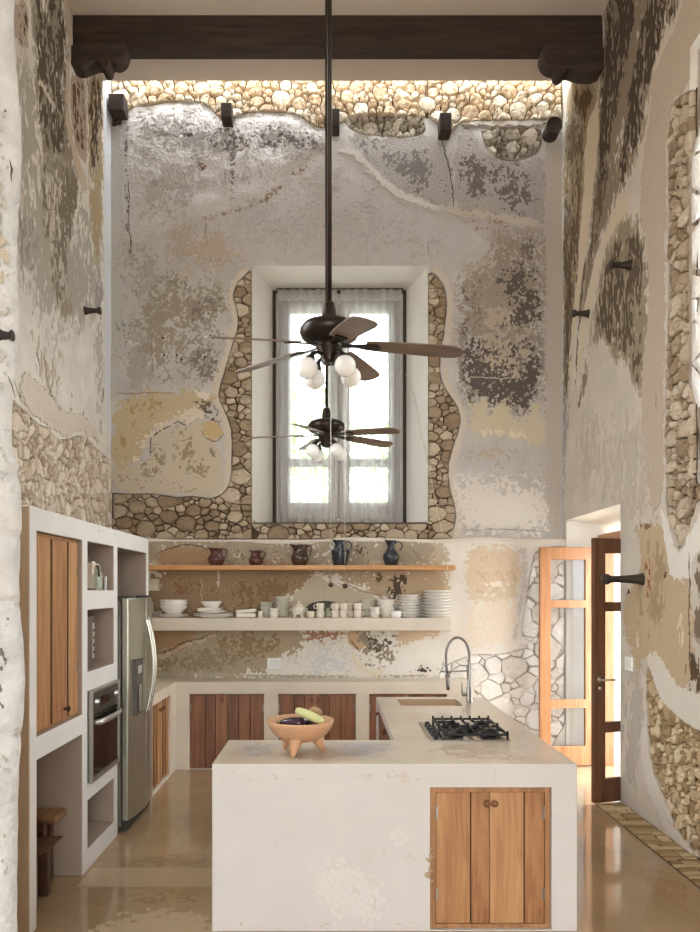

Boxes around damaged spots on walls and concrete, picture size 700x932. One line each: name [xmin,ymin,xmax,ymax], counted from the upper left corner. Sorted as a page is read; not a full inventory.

flaking render [11,271,460,565]
damp [0,0,548,493]
flaking render [112,81,562,161]
crack [441,140,455,205]
damp [562,0,700,797]
flaking render [664,88,700,549]
spalling [347,631,365,651]
flaking render [646,668,700,857]